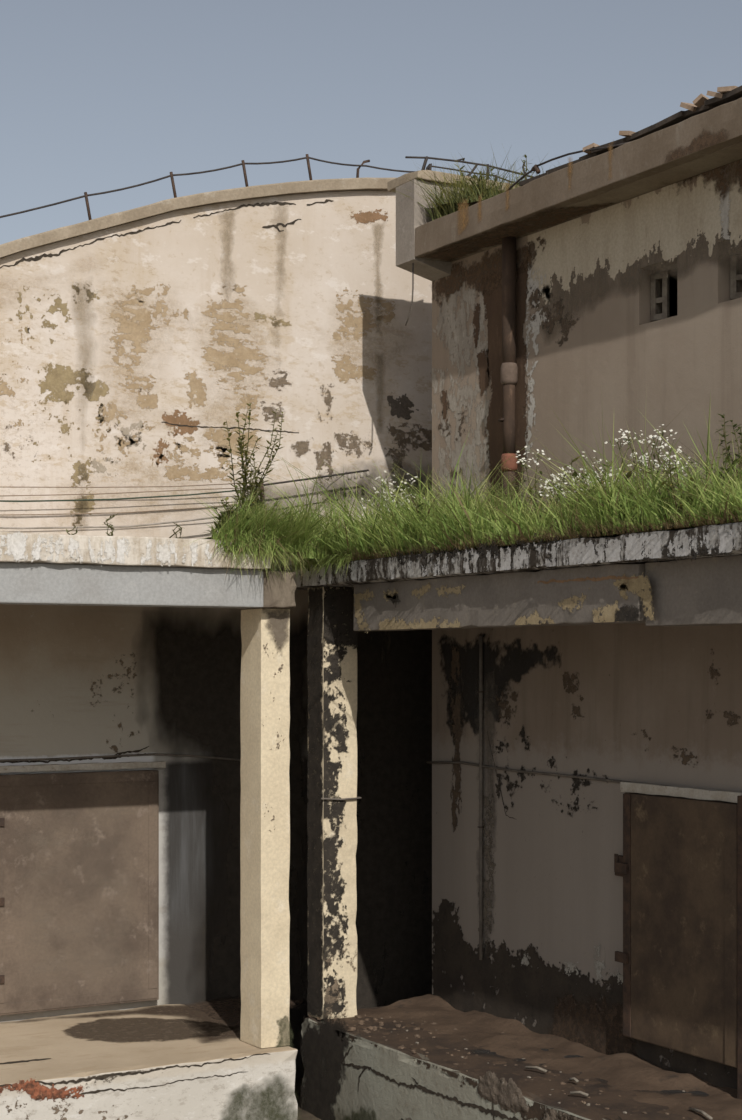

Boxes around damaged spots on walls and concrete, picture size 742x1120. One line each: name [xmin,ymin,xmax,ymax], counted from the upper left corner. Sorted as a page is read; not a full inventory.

crack [0,199,333,268]
peeling [527,283,578,347]
peeling [0,283,292,526]
peeling [515,588,590,625]
water stain [76,615,242,1042]
water stain [224,563,623,1120]
crack [0,1053,268,1095]
crack [341,1045,518,1120]
water stain [629,1037,737,1096]